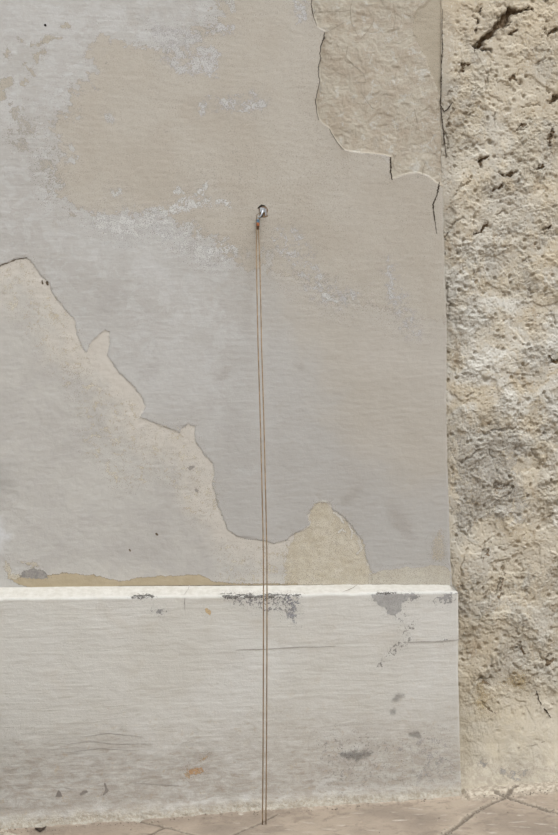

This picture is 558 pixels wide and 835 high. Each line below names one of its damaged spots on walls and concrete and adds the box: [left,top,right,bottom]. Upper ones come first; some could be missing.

crack [311,0,344,150]
crack [432,182,440,234]
peeling [0,0,458,622]
damp [233,596,299,623]